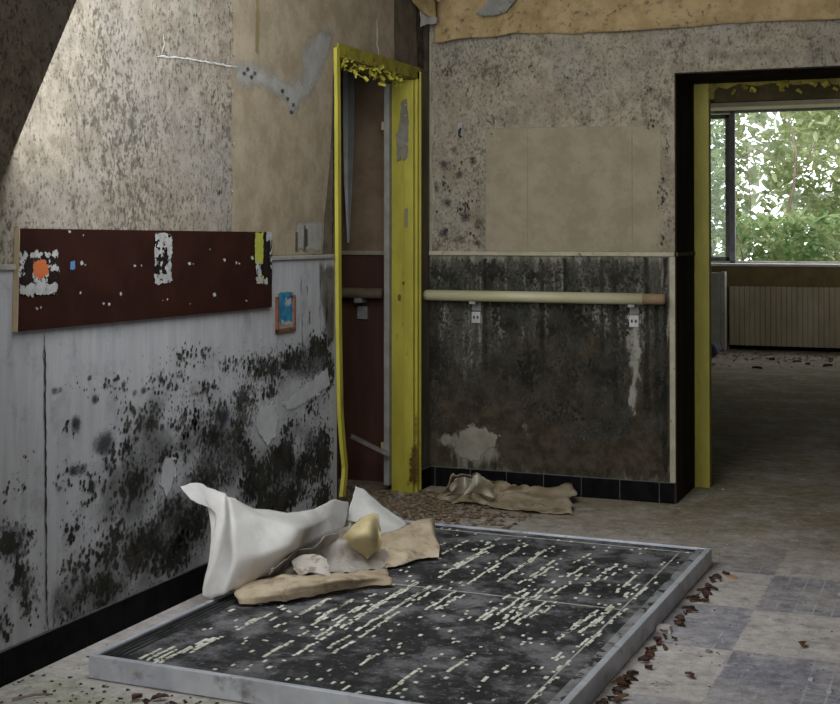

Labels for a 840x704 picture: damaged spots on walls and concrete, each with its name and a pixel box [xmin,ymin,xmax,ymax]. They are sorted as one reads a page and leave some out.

leakage [0,265,334,643]
spalling [444,422,501,462]
leakage [429,256,670,482]